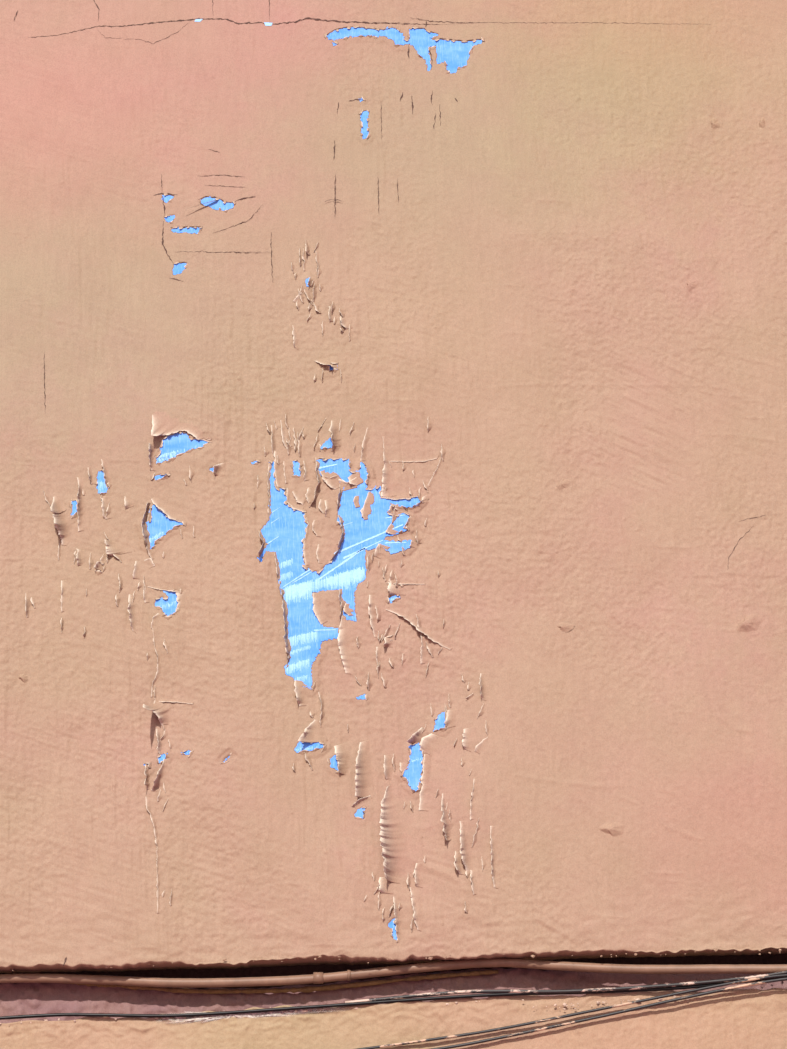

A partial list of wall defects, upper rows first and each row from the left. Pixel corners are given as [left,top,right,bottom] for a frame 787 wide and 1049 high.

crack [37,0,662,57]
peeling [323,25,485,74]
peeling [358,95,372,139]
crack [337,91,458,139]
peeling [162,193,203,235]
peeling [187,196,237,213]
peeling [173,260,188,275]
peeling [291,240,353,351]
peeling [148,411,212,482]
peeling [209,462,229,476]
peeling [43,459,196,913]
peeling [251,414,499,943]